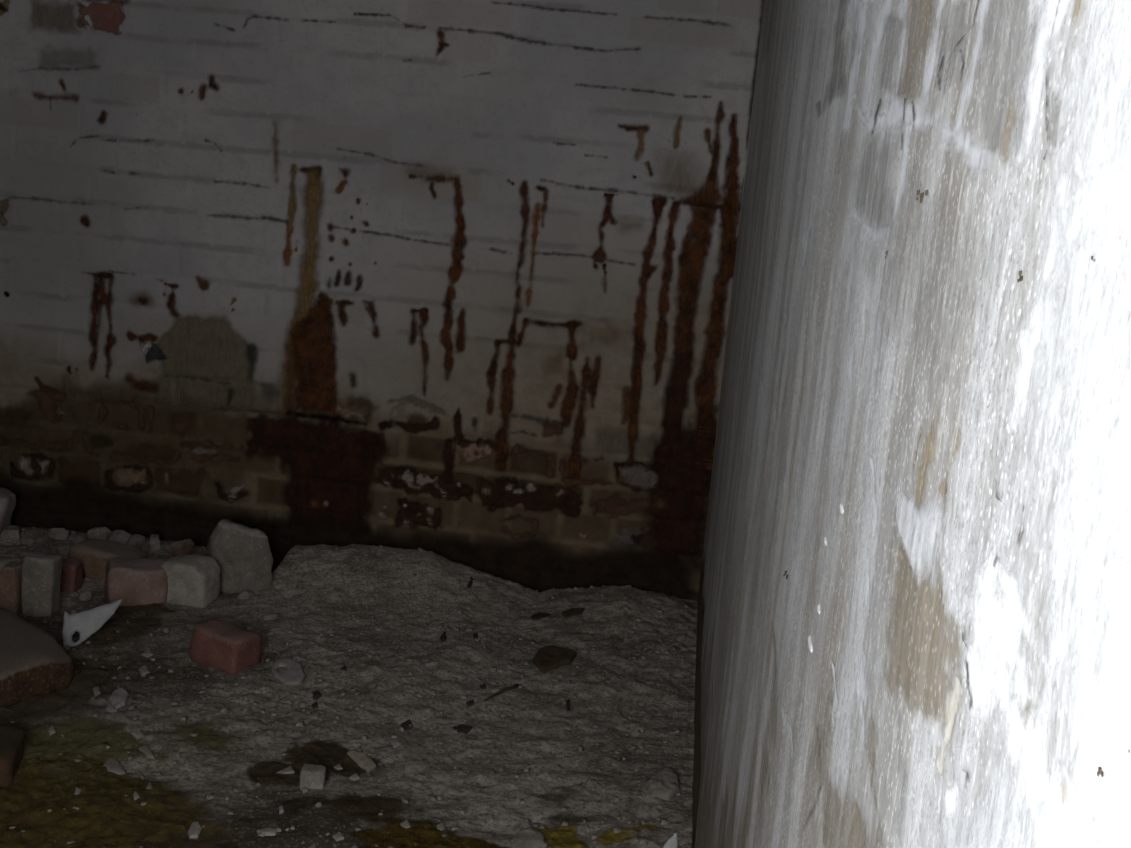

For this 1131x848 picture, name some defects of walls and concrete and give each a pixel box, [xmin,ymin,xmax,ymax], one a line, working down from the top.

rust [89,272,116,378]
leakage [157,316,257,412]
rust [247,164,386,533]
rust [410,308,429,395]
rust [409,174,467,379]
rust [486,180,601,488]
rust [592,193,616,292]
rust [619,102,741,567]
leakage [0,476,748,848]